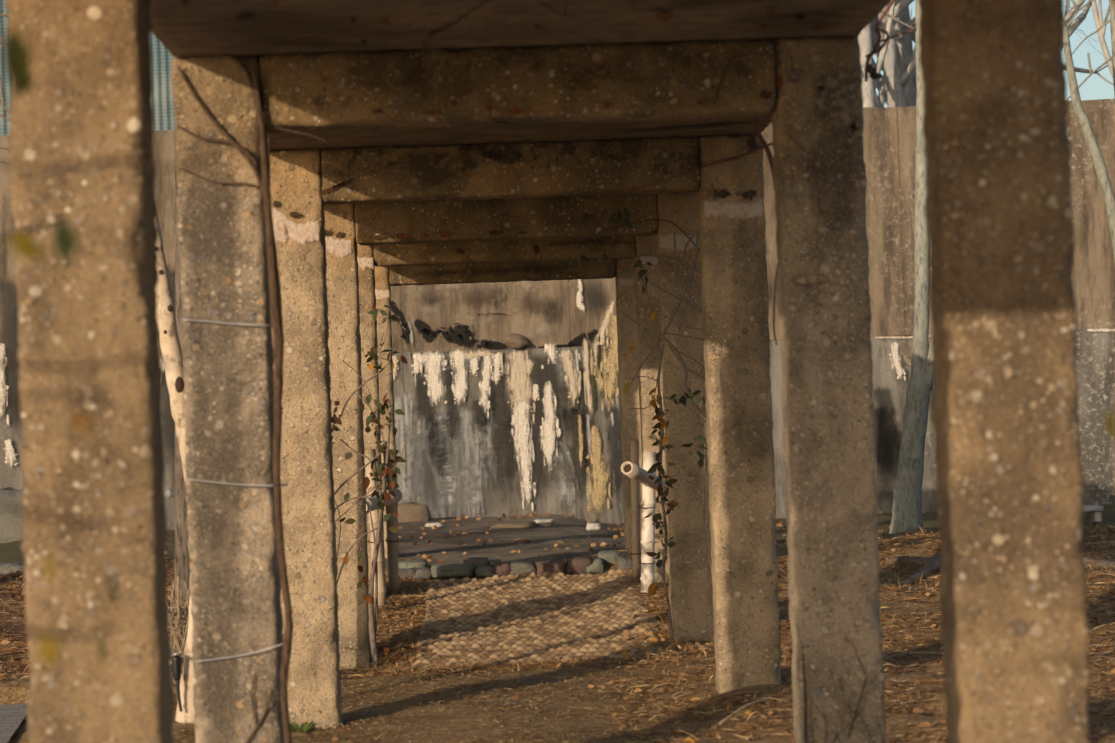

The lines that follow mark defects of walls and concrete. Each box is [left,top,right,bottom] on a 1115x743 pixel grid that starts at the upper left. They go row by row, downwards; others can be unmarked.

water stain [319,123,740,187]
water stain [392,266,622,519]